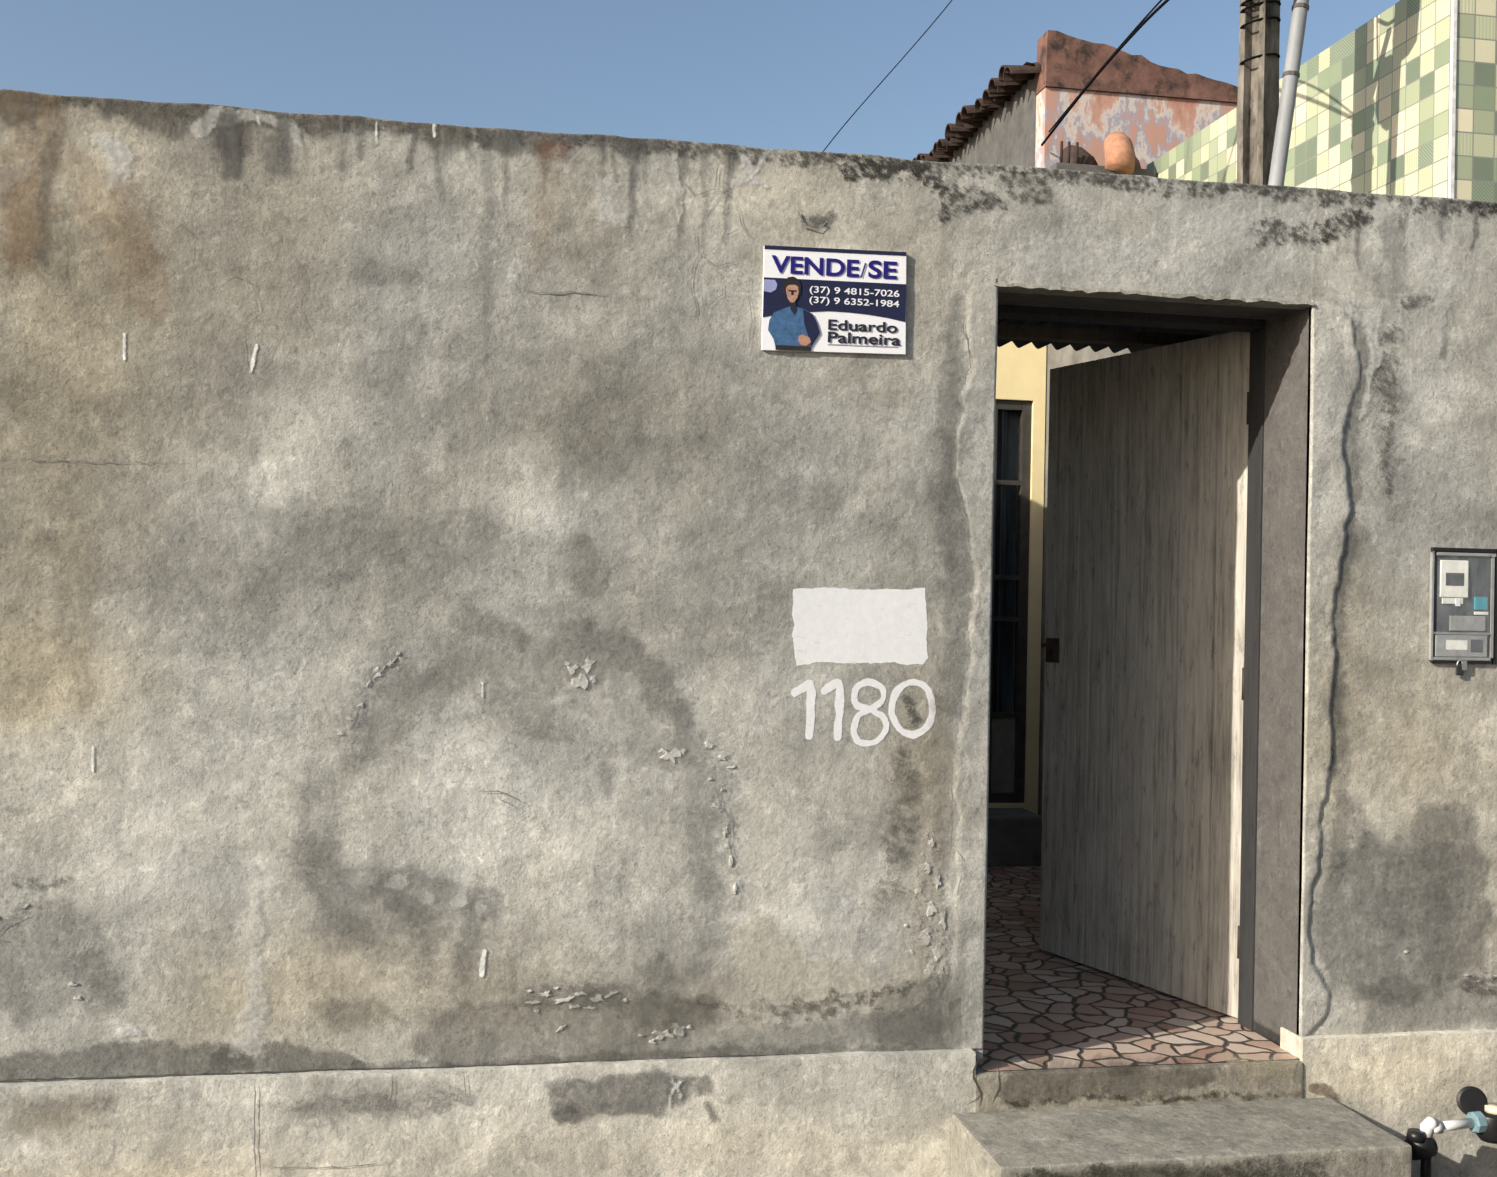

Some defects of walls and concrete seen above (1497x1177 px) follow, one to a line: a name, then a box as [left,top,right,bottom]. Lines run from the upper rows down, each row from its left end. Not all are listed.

water stain [0,89,1497,247]
spalling [525,987,628,1033]
spalling [638,1023,693,1045]
water stain [552,1074,712,1122]